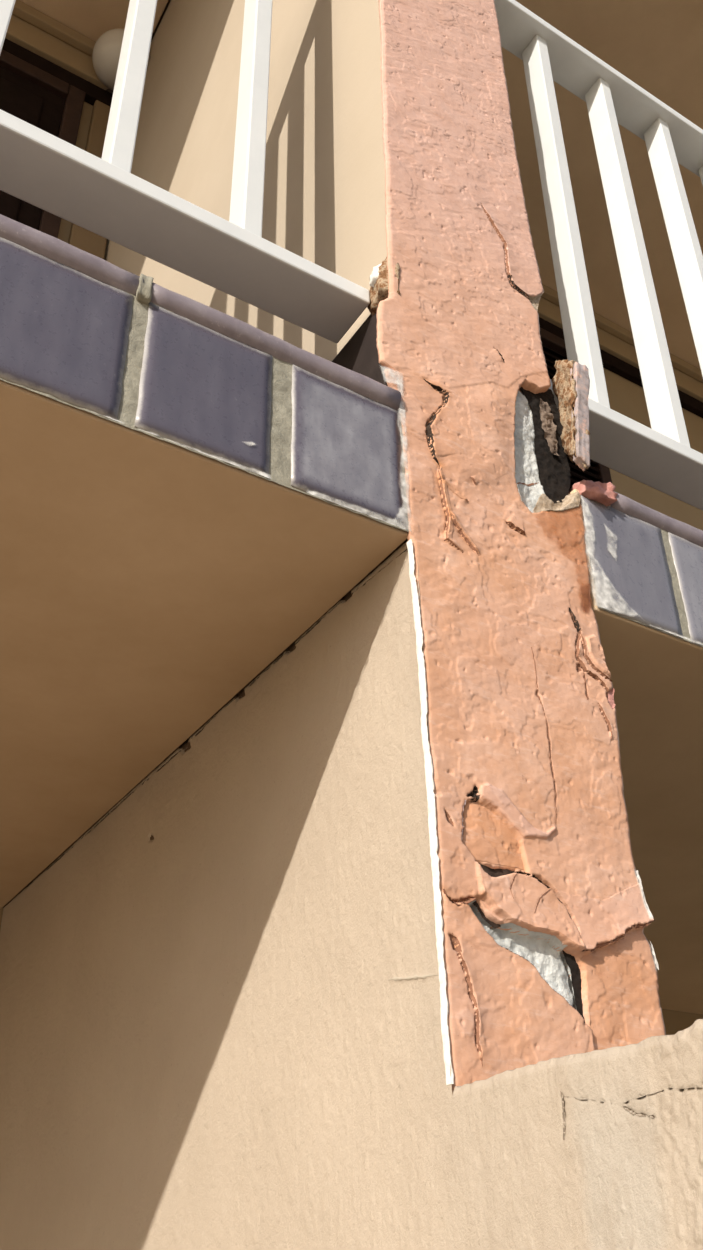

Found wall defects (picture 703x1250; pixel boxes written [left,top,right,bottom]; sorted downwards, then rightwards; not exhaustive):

crack [482,206,542,315]
crack [424,379,449,466]
spalling [514,386,581,513]
crack [388,863,569,1061]
spalling [445,783,655,1023]
crack [560,1088,689,1140]